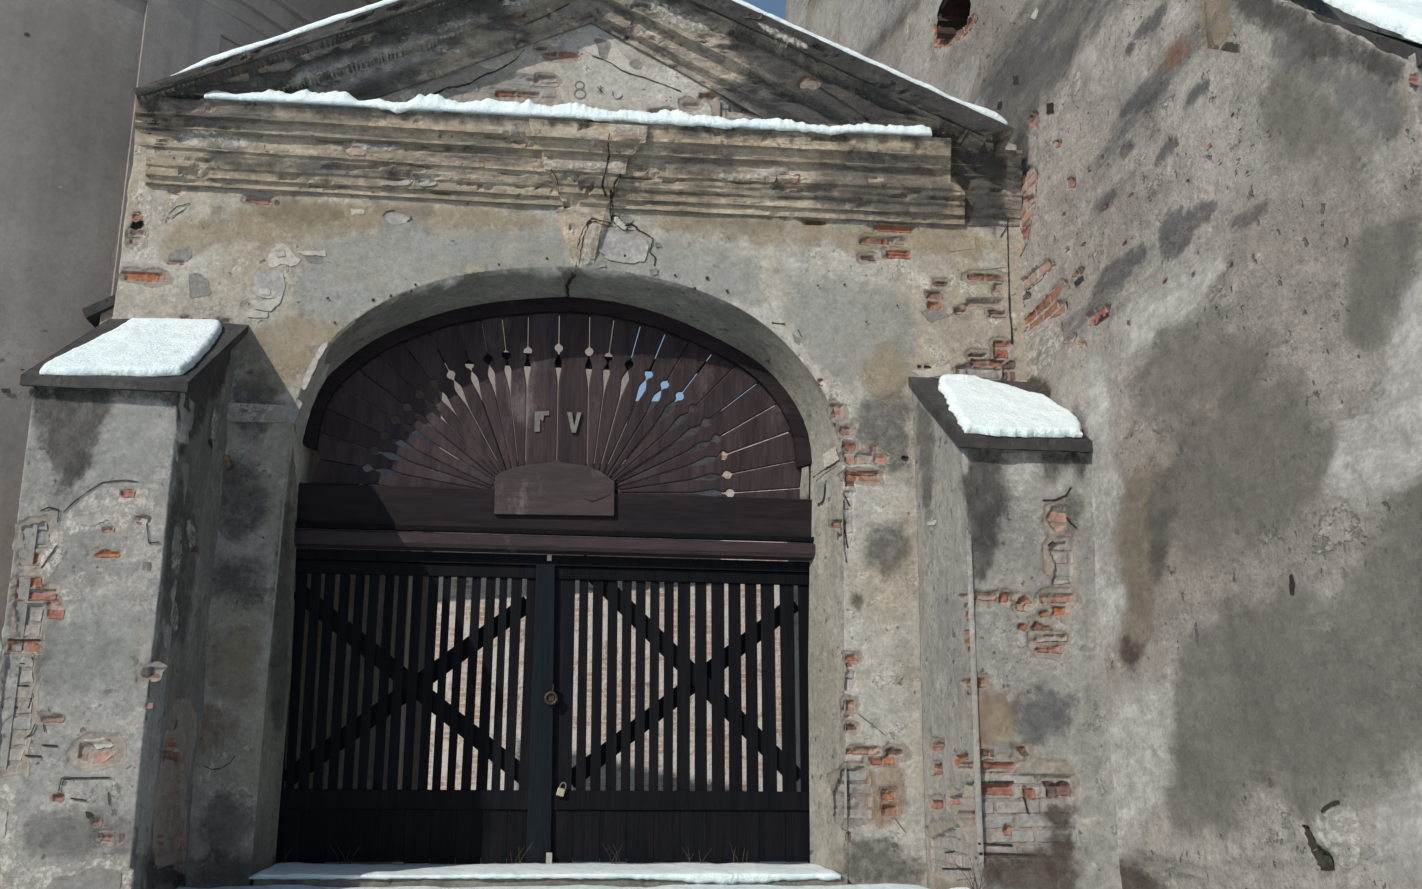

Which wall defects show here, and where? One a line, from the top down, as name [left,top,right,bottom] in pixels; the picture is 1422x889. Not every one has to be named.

water stain [297,31,518,134]
water stain [544,119,624,169]
spalling [1027,102,1054,127]
crack [565,133,661,298]
spalling [856,222,919,265]
spalling [912,165,1111,381]
water stain [1121,254,1225,358]
water stain [29,387,109,494]
water stain [957,448,1010,580]
spalling [957,499,1083,661]
spalling [0,485,199,889]
spalling [827,650,1081,889]